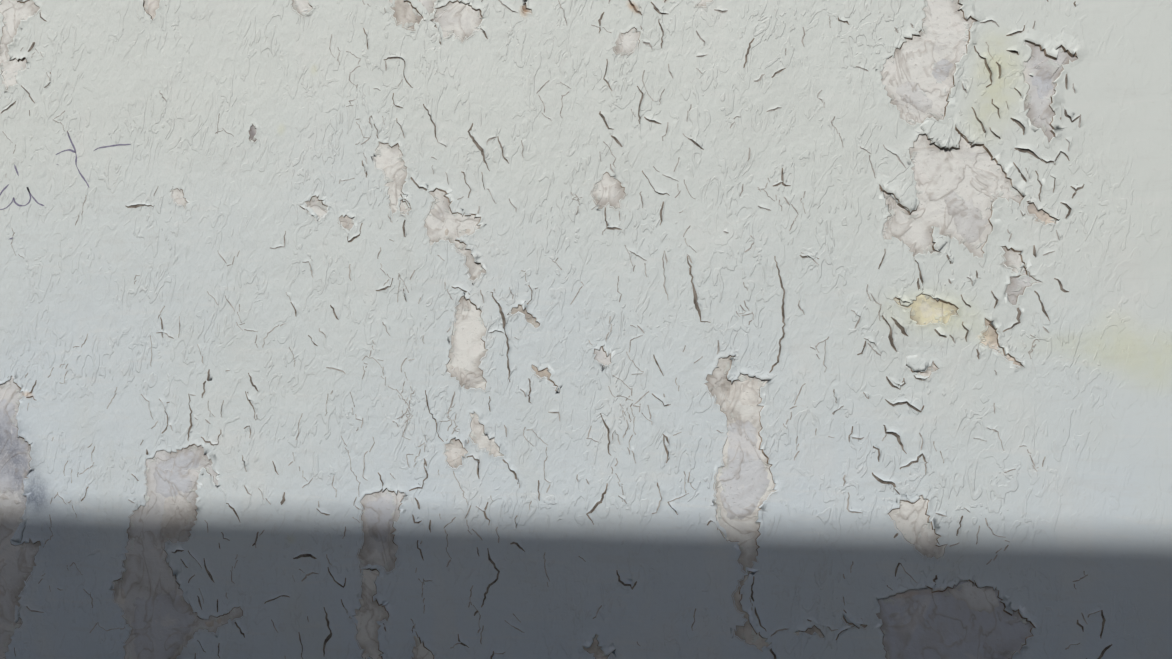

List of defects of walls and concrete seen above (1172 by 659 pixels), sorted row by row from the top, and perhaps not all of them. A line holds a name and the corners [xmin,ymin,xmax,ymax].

peeling [0,371,45,659]
crack [1,11,73,178]
crack [7,334,88,411]
crack [13,437,125,657]
peeling [108,438,248,659]
crack [107,0,739,659]
peeling [370,137,510,472]
peeling [700,349,782,574]
crack [723,0,1085,565]
peeling [874,0,1065,373]
peeling [1015,27,1088,148]
crack [1065,571,1112,659]